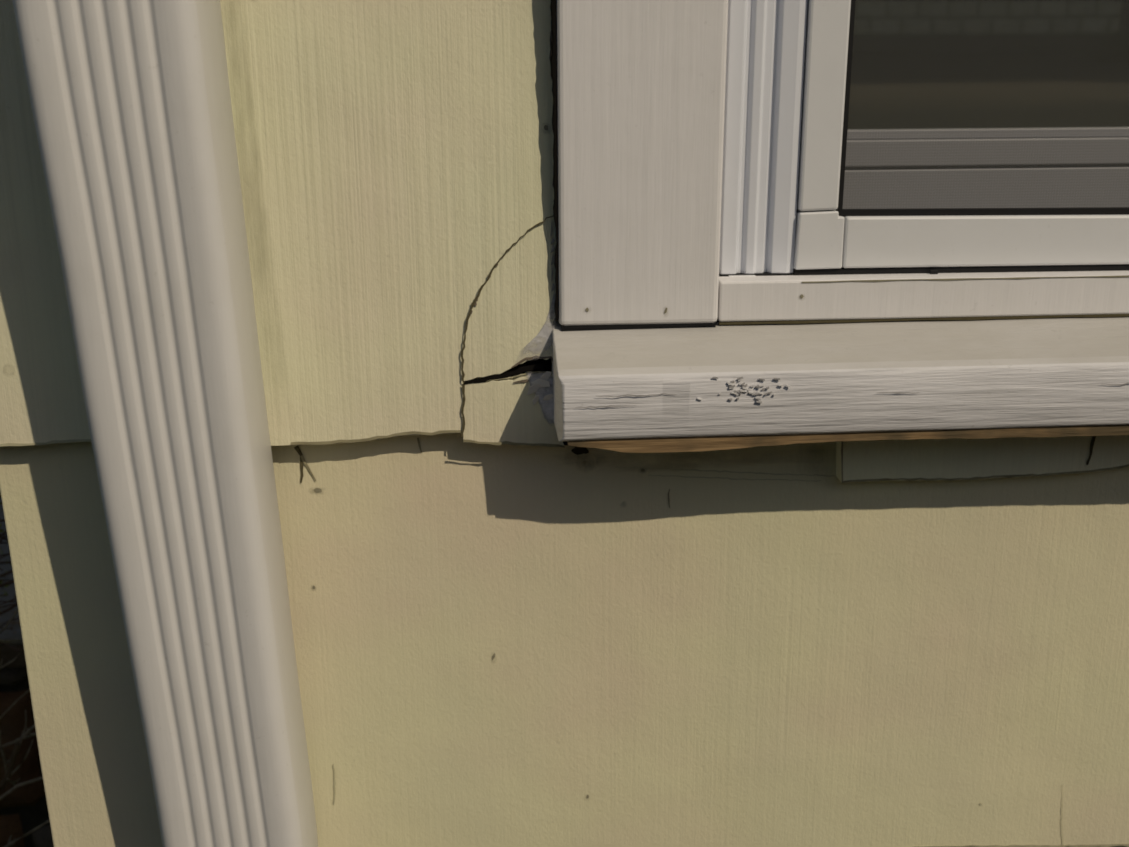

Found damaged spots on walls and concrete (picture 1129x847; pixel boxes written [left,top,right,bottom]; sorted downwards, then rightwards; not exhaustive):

crack [461,215,554,437]
crack [1086,436,1096,465]